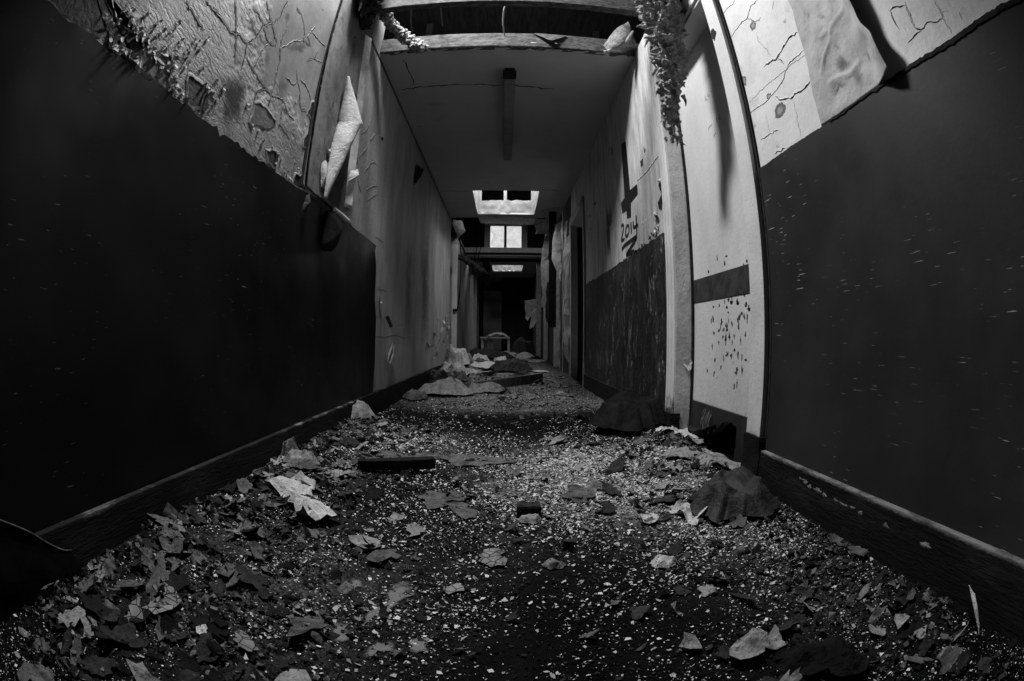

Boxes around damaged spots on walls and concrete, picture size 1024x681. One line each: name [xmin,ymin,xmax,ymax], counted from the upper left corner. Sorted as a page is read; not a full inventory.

flaking render [48,0,226,111]
crack [187,0,325,140]
crack [723,1,810,154]
crack [890,0,963,42]
flaking render [247,100,307,192]